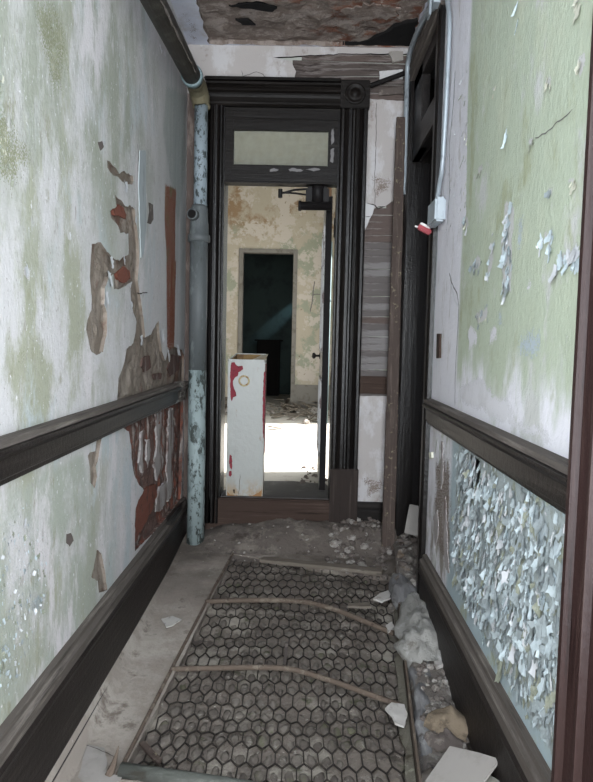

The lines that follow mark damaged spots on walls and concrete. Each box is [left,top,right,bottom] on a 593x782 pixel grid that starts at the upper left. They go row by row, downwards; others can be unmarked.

flaking render [196,0,428,47]
flaking render [107,160,134,192]
flaking render [86,195,184,400]
peeling [468,201,515,305]
peeling [536,229,580,282]
flaking render [88,438,102,488]
flaking render [124,400,184,551]
peeling [0,504,52,697]
peeling [429,441,565,754]